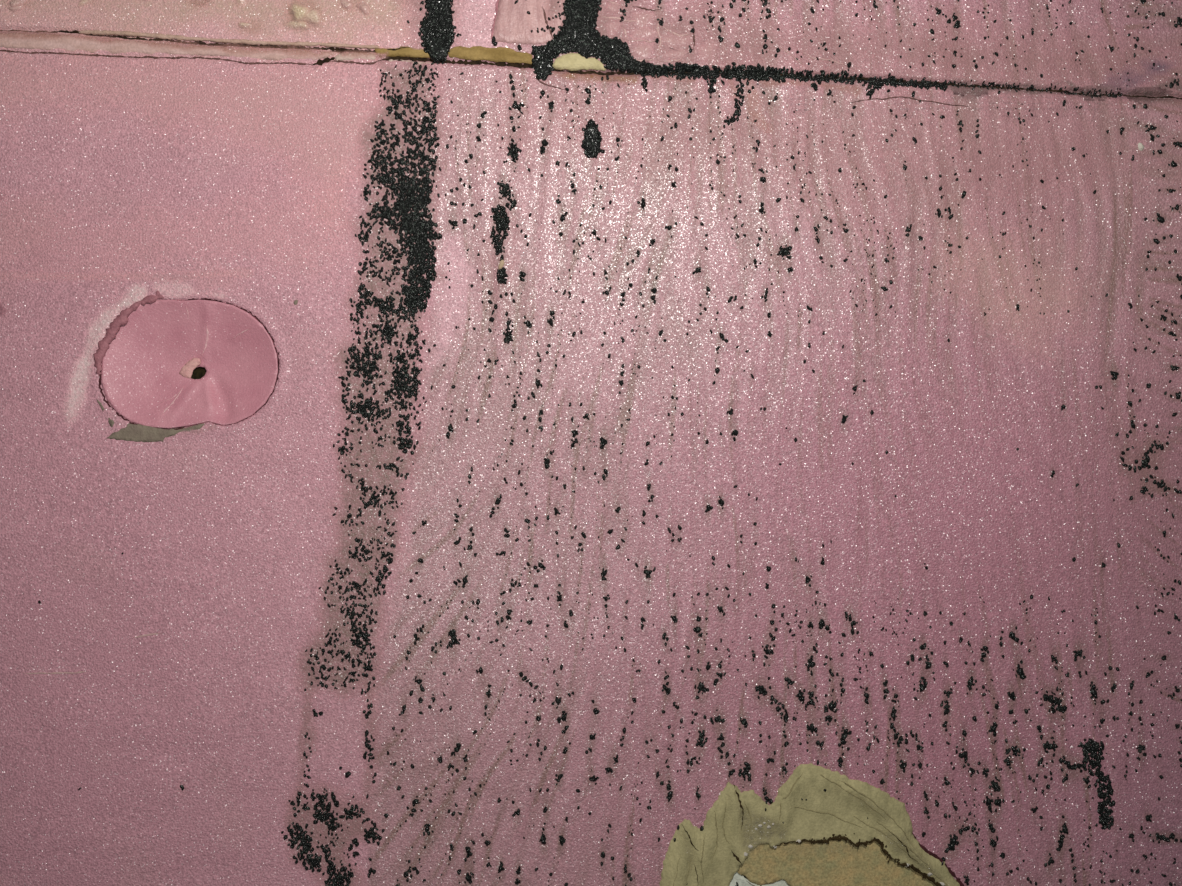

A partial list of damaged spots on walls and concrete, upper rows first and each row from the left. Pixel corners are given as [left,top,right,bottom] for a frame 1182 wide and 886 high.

crack [0,30,638,89]
crack [775,73,1182,106]
damp [593,238,667,368]
damp [686,144,813,385]
damp [773,104,926,316]
damp [1106,103,1182,299]
peeling [97,400,205,442]
damp [558,353,653,463]
damp [1095,371,1182,635]
damp [392,484,682,740]
peeling [659,763,964,886]
damp [523,575,1182,886]